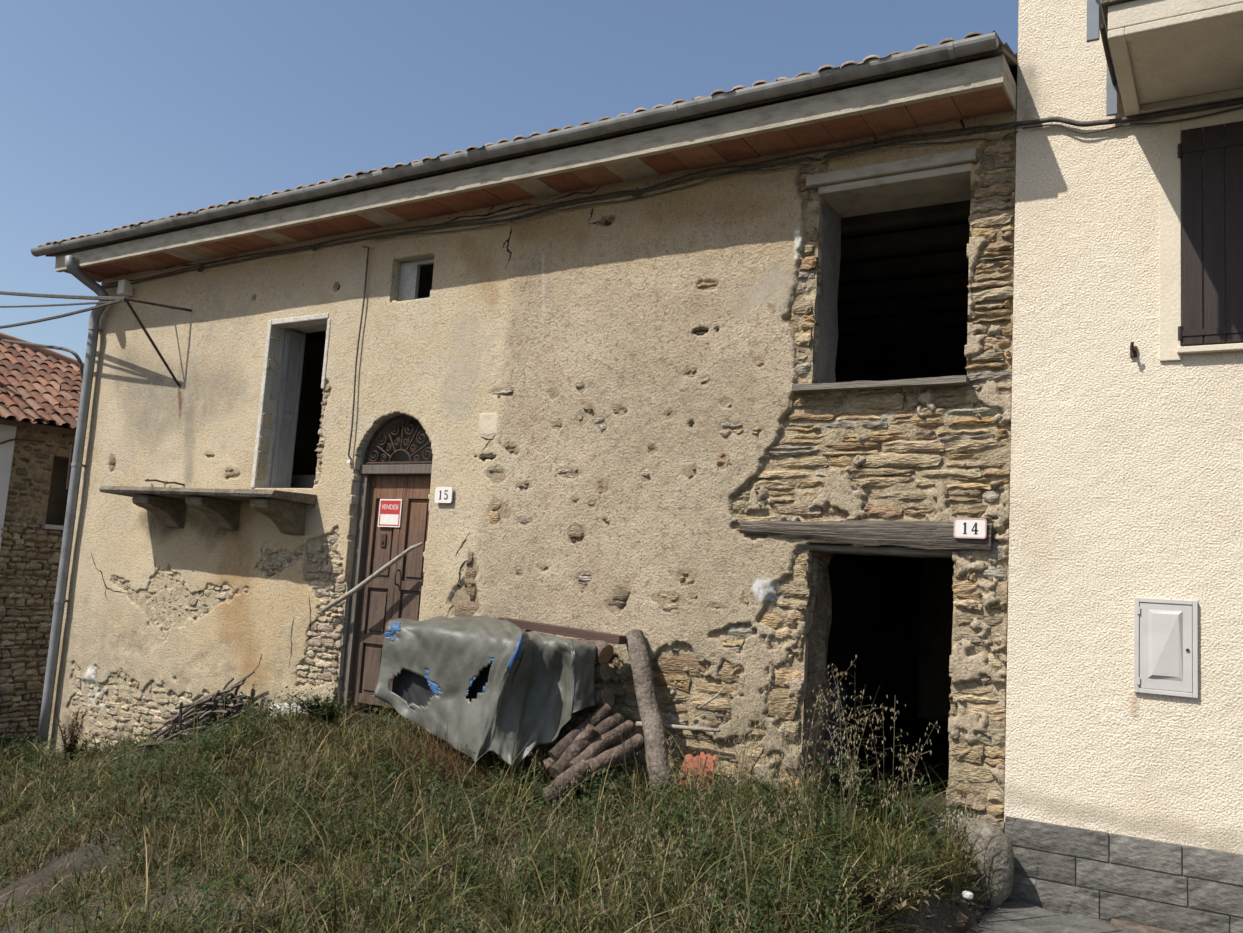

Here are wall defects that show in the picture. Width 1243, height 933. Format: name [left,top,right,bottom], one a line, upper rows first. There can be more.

crack [444,186,606,269]
spalling [716,399,763,469]
flaking render [731,138,1016,829]
spalling [568,525,587,544]
spalling [112,565,249,641]
spalling [256,527,349,687]
spalling [450,551,479,616]
spalling [605,588,631,613]
spalling [67,662,209,752]
flaking render [556,656,642,751]
flaking render [651,543,814,798]
flaking render [601,747,649,787]